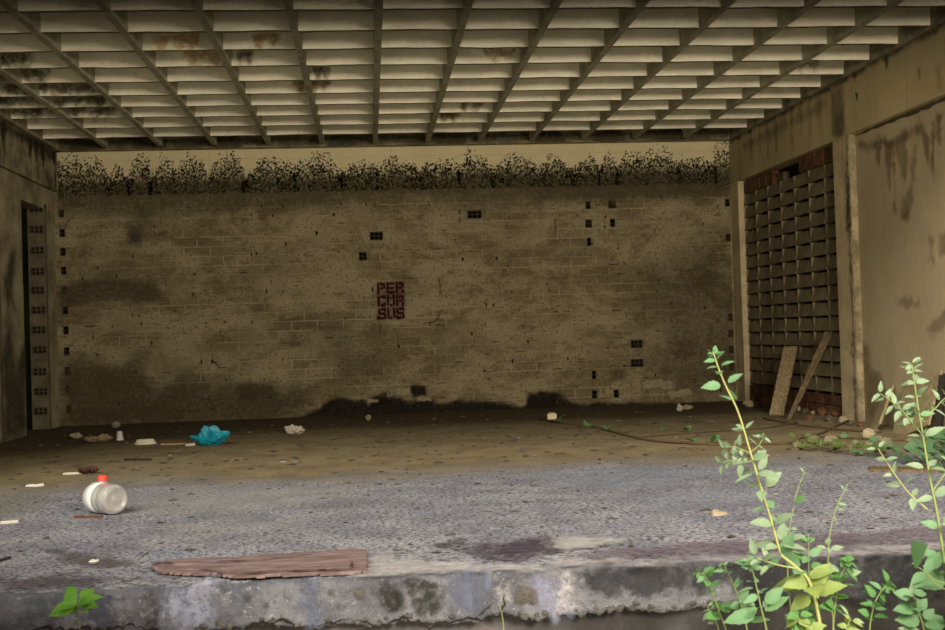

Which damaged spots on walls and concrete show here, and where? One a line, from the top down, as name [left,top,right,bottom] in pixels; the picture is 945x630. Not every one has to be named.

leakage [0,43,909,213]
leakage [60,278,160,306]
leakage [61,360,660,426]
spalling [193,617,314,630]
spalling [516,586,560,622]
spalling [574,600,724,618]